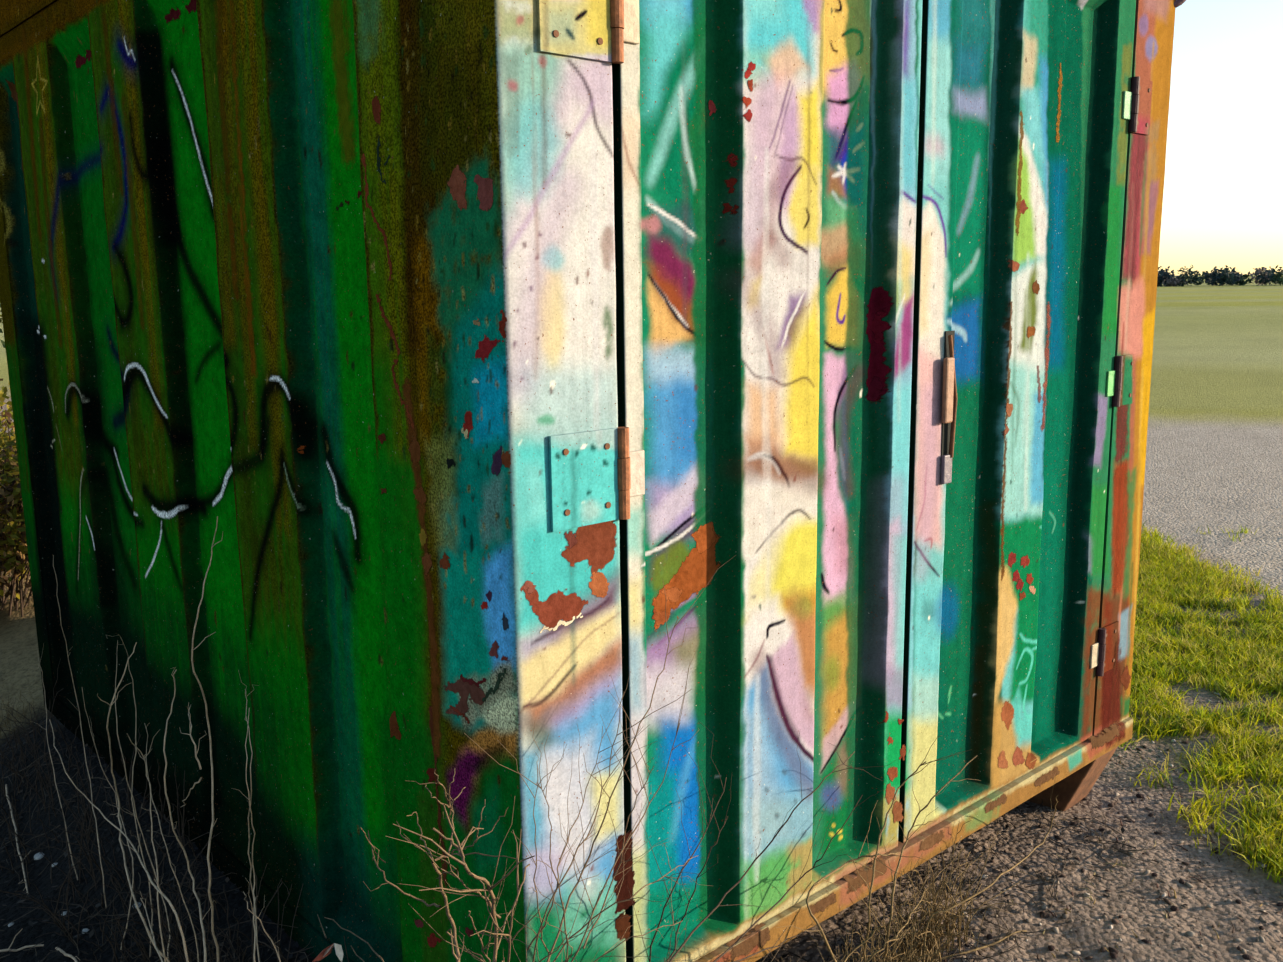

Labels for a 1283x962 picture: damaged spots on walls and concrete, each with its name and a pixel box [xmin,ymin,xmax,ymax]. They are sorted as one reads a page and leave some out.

peeling [521,520,617,633]
peeling [444,613,509,724]
rust [1001,701,1014,730]
rust [878,711,906,823]
rust [998,746,1060,786]
rust [985,793,1007,813]
rust [613,830,636,941]
rust [809,857,887,915]
rust [727,923,771,962]